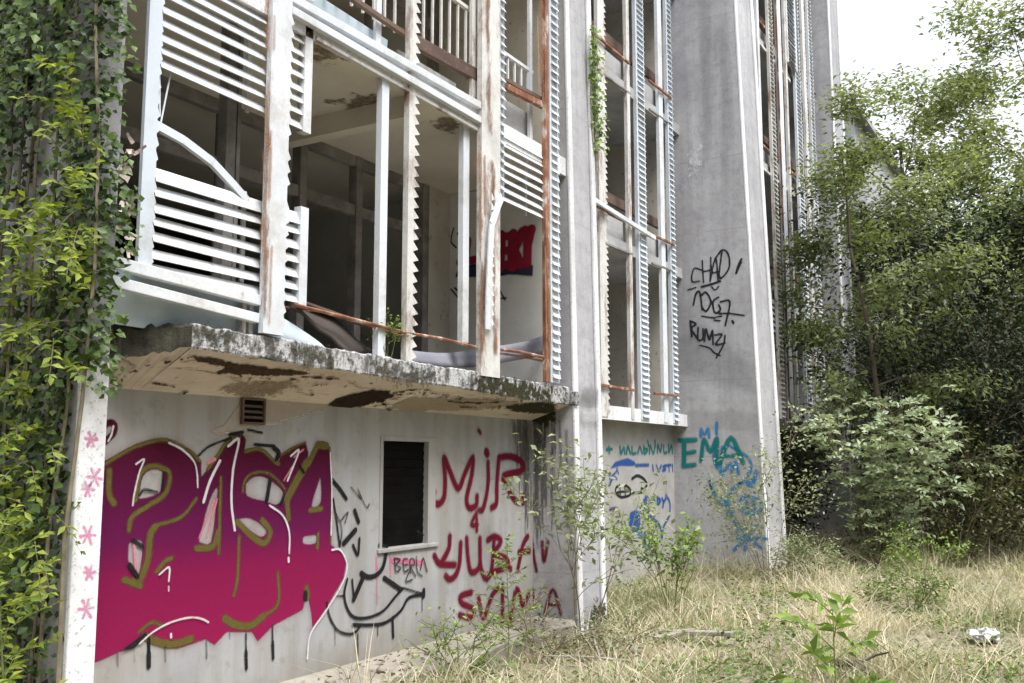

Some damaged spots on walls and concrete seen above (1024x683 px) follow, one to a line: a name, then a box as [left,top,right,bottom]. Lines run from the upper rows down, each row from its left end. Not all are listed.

rust [265,0,275,54]
rust [260,85,273,321]
rust [476,74,498,354]
leakage [513,414,568,545]